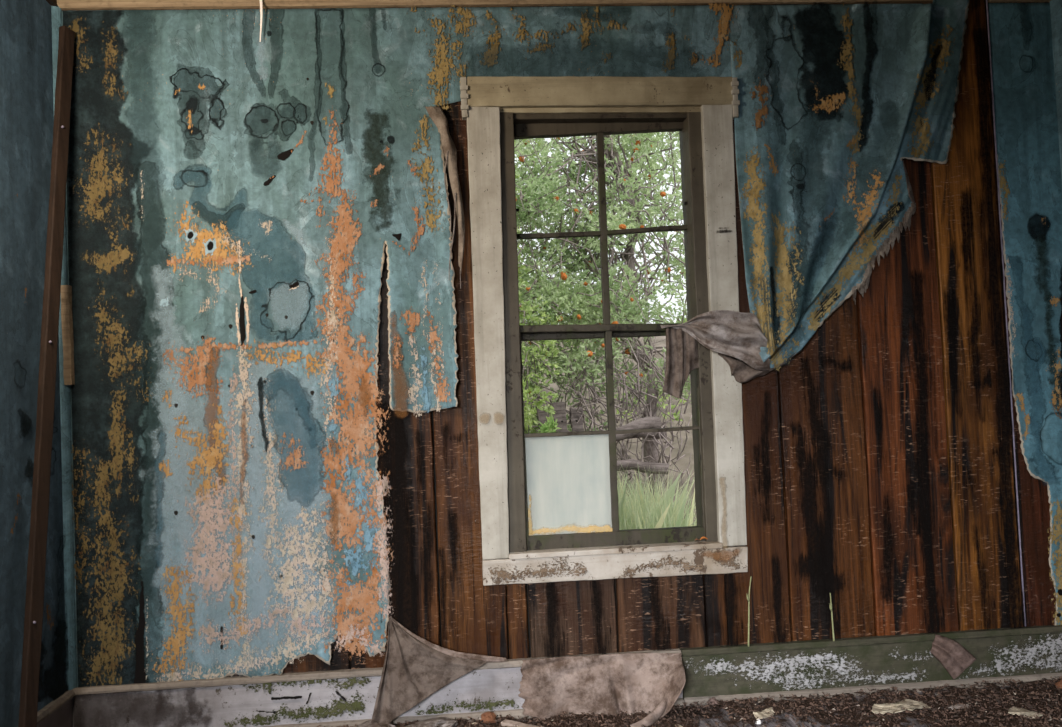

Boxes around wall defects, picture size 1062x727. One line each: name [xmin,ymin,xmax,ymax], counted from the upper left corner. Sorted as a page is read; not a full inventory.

leakage [169,67,229,152]
leakage [244,9,394,230]
leakage [747,2,849,141]
peeling [738,0,904,370]
peeling [907,24,957,159]
peeling [407,260,444,422]
leakage [943,290,991,415]
peeling [1006,256,1018,358]
peeling [488,557,588,583]
peeling [620,550,746,576]
leakage [795,356,852,640]
leakage [906,270,945,633]